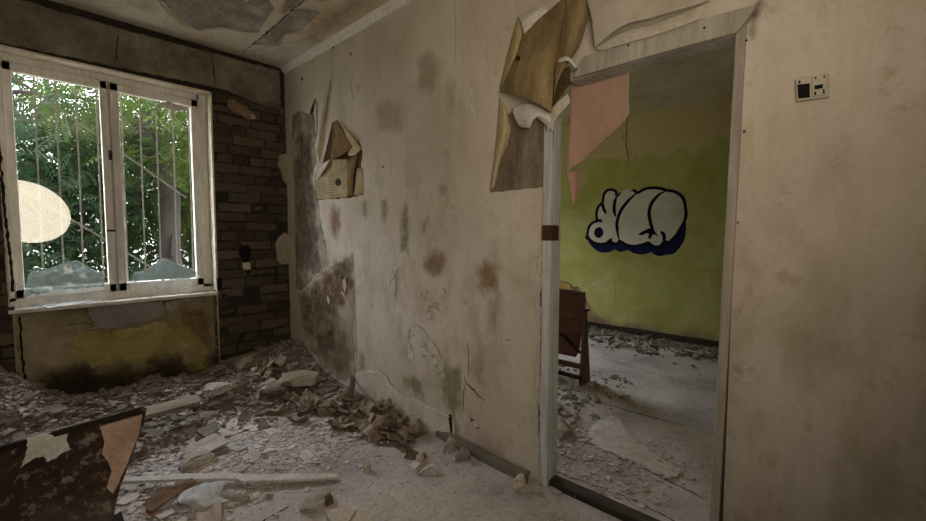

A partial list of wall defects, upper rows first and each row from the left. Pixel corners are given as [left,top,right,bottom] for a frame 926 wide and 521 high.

peeling [158,0,329,47]
flaking render [292,99,356,379]
damp [44,312,210,395]
flaking render [580,300,719,376]